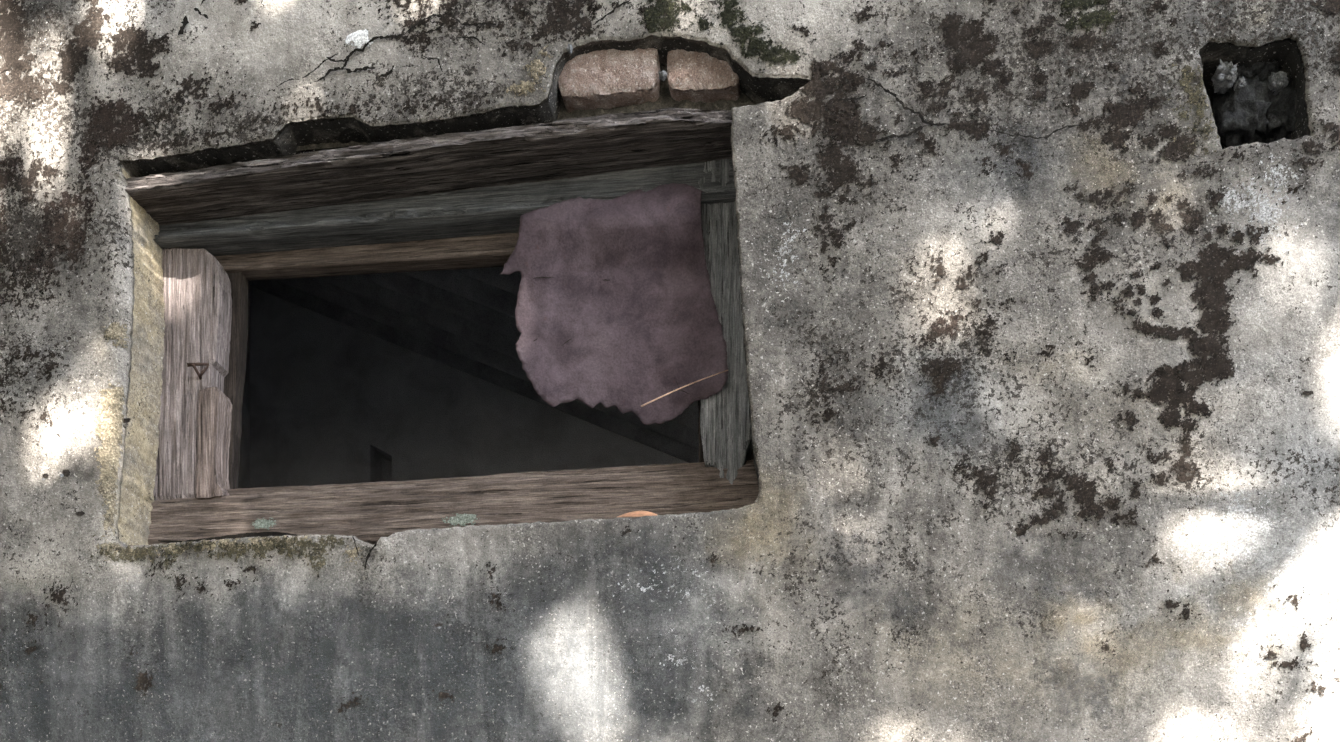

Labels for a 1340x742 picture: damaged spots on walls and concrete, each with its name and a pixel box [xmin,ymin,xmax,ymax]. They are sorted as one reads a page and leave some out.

crack [178,0,208,35]
crack [276,14,499,87]
spalling [504,43,760,121]
crack [840,78,946,142]
crack [989,125,1083,139]